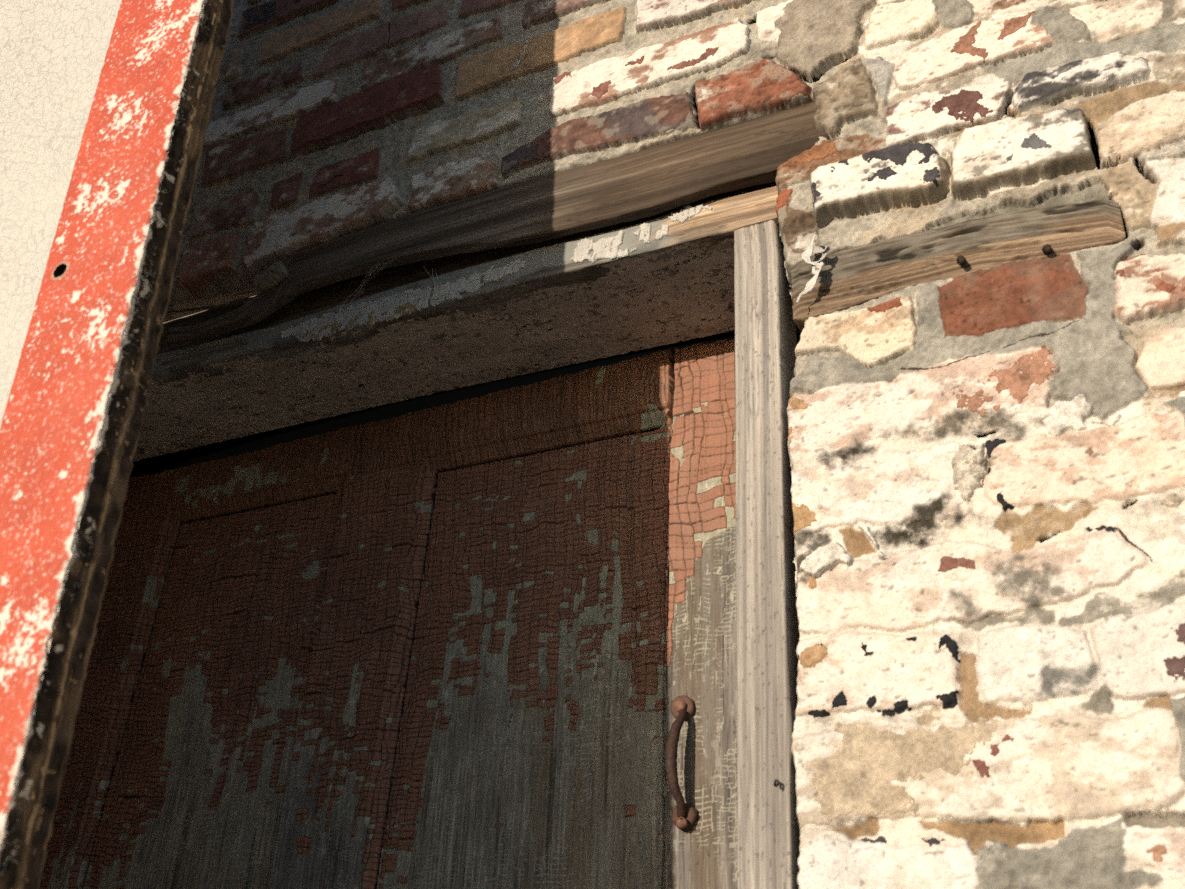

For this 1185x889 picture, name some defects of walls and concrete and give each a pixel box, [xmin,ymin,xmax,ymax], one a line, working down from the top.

peeling [591,78,616,100]
peeling [667,47,719,70]
crack [1087,121,1155,239]
peeling [571,204,712,263]
peeling [280,259,526,342]
peeling [40,339,736,889]